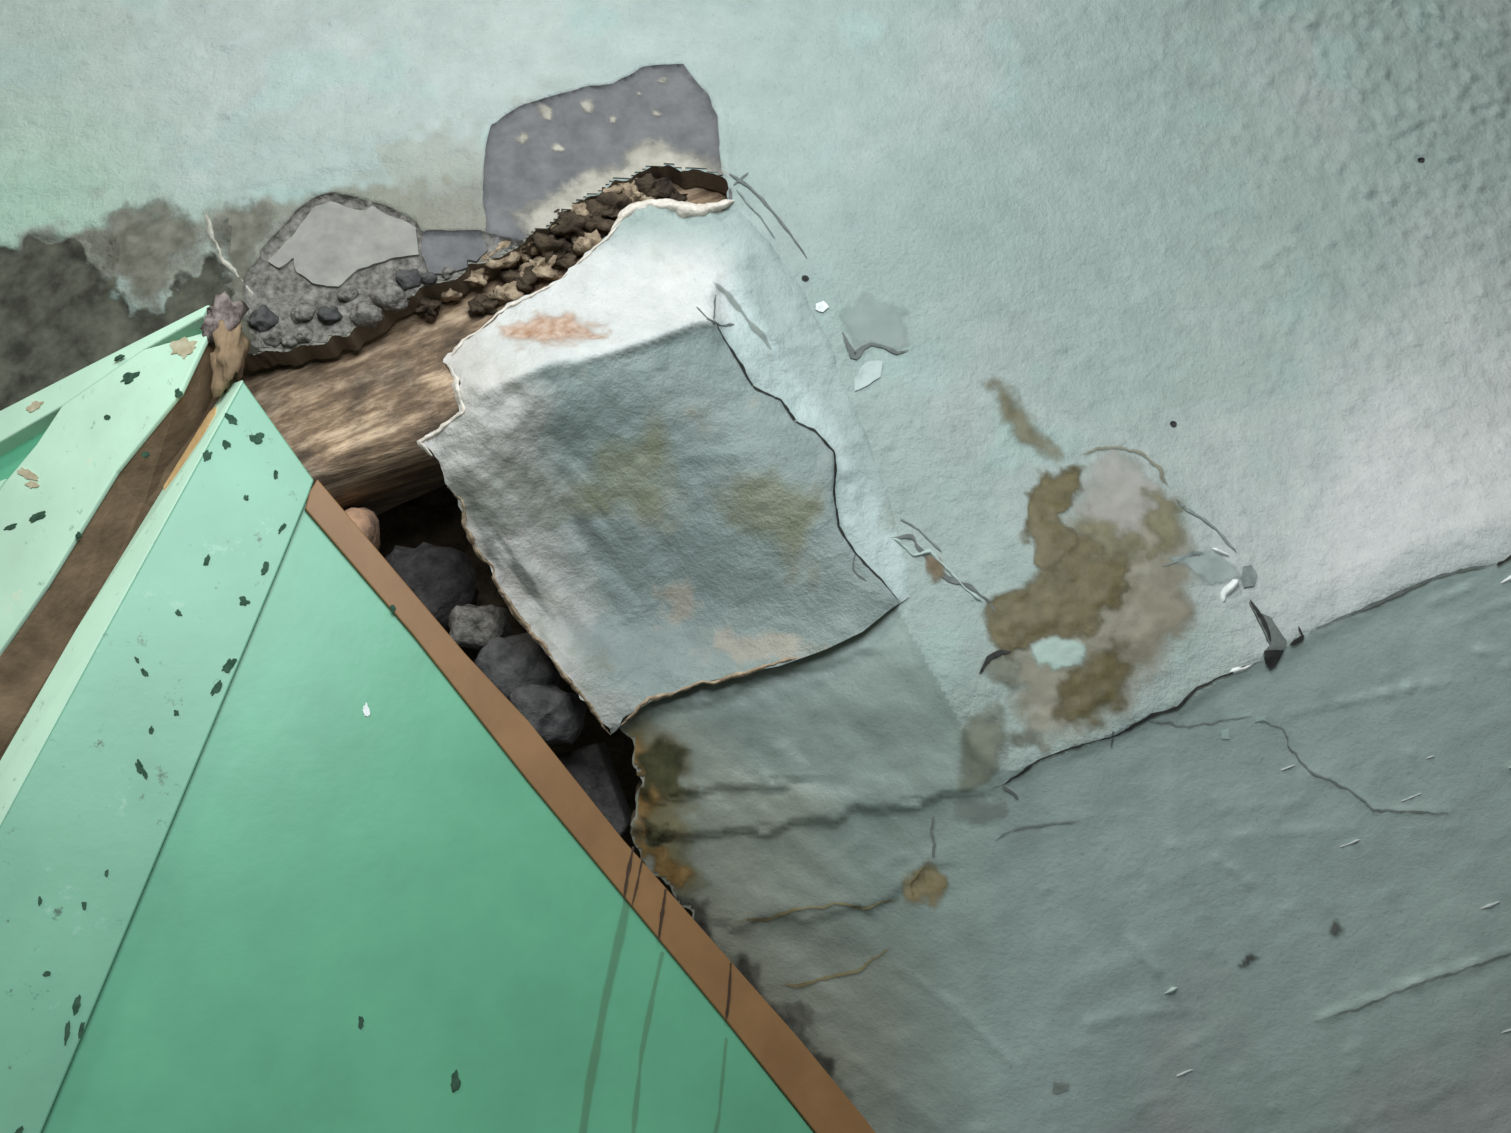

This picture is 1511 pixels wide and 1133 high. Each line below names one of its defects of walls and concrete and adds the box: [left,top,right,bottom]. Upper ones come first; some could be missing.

flaking render [206,64,732,351]
crack [697,294,996,613]
leakage [958,381,1191,821]
crack [1163,499,1236,566]
crack [1309,563,1496,632]
crack [929,817,937,857]
crack [992,662,1446,841]